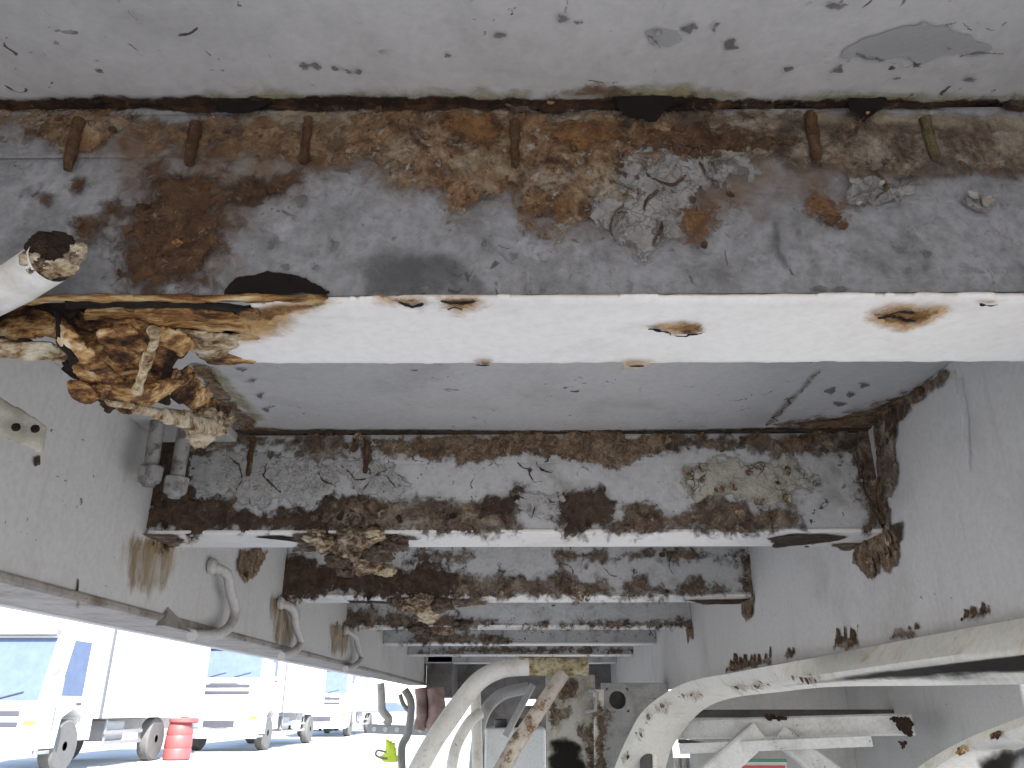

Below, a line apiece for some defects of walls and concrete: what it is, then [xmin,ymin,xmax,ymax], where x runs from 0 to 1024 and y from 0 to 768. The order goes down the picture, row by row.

peeling [832,23,996,73]
corrosion [0,108,364,172]
peeling [590,120,762,262]
peeling [19,242,88,280]
corrosion [377,296,424,308]
corrosion [441,298,476,310]
corrosion [648,322,702,337]
corrosion [869,306,948,332]
peeling [187,433,412,529]
peeling [680,446,822,533]
peeling [867,412,899,531]
spalling [768,534,862,551]